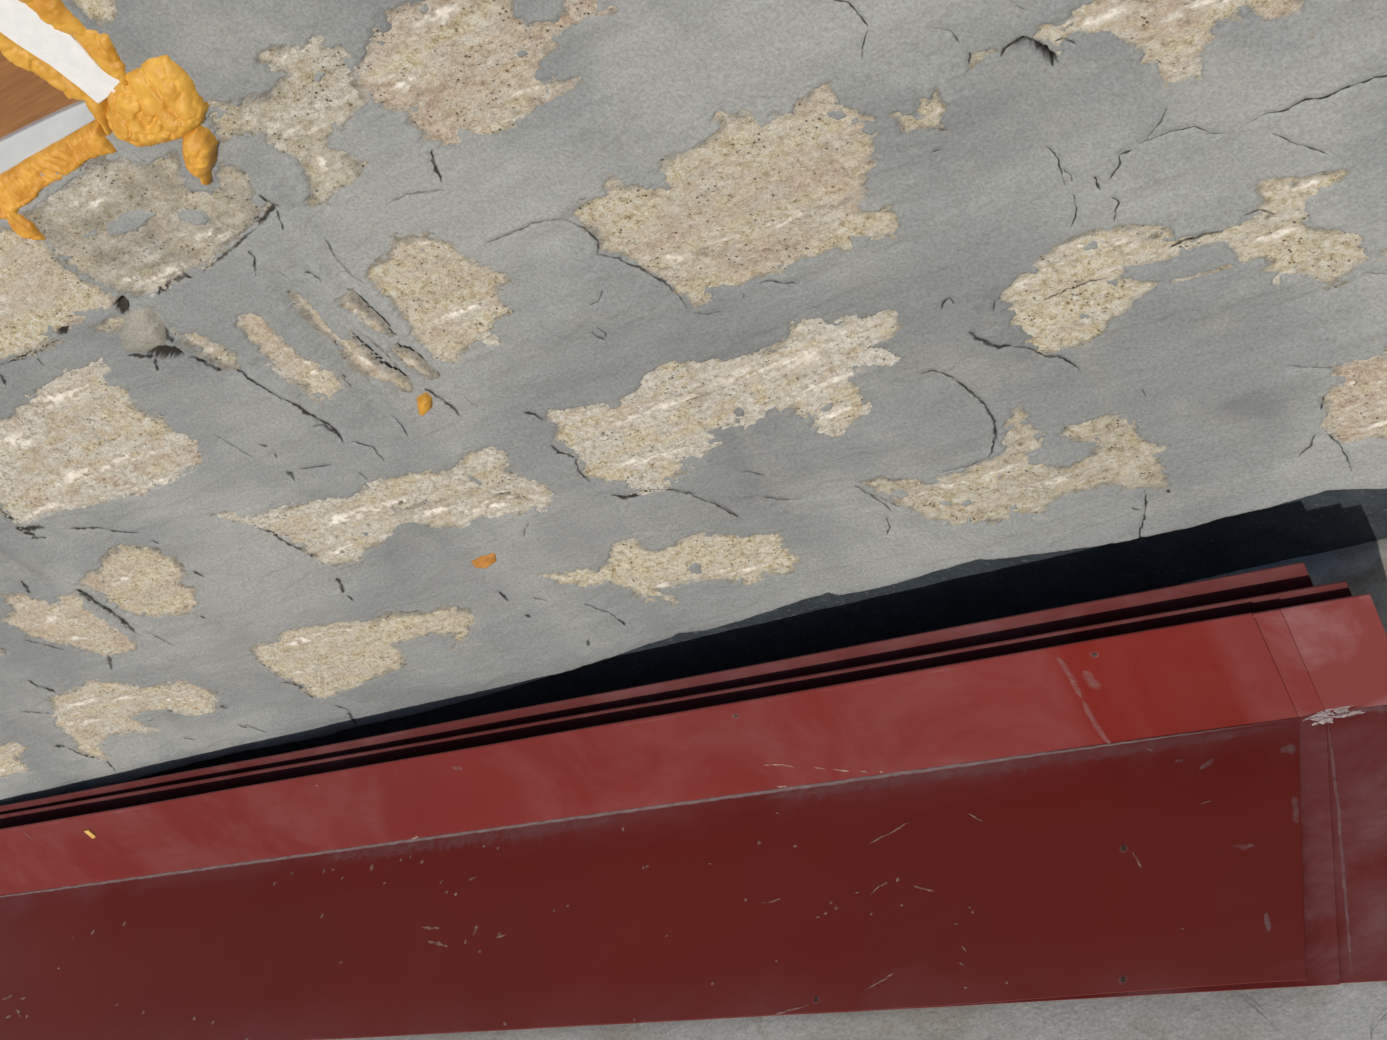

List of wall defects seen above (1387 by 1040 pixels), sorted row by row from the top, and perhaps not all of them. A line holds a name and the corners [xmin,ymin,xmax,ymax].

spalling [0,150,278,370]
crack [114,196,283,314]
spalling [207,0,618,208]
spalling [573,83,949,309]
spalling [1000,169,1387,357]
crack [1253,75,1387,154]
spalling [0,358,203,529]
crack [129,329,384,480]
spalling [210,446,554,569]
spalling [542,309,903,495]
crack [922,370,997,455]
spalling [249,605,476,699]